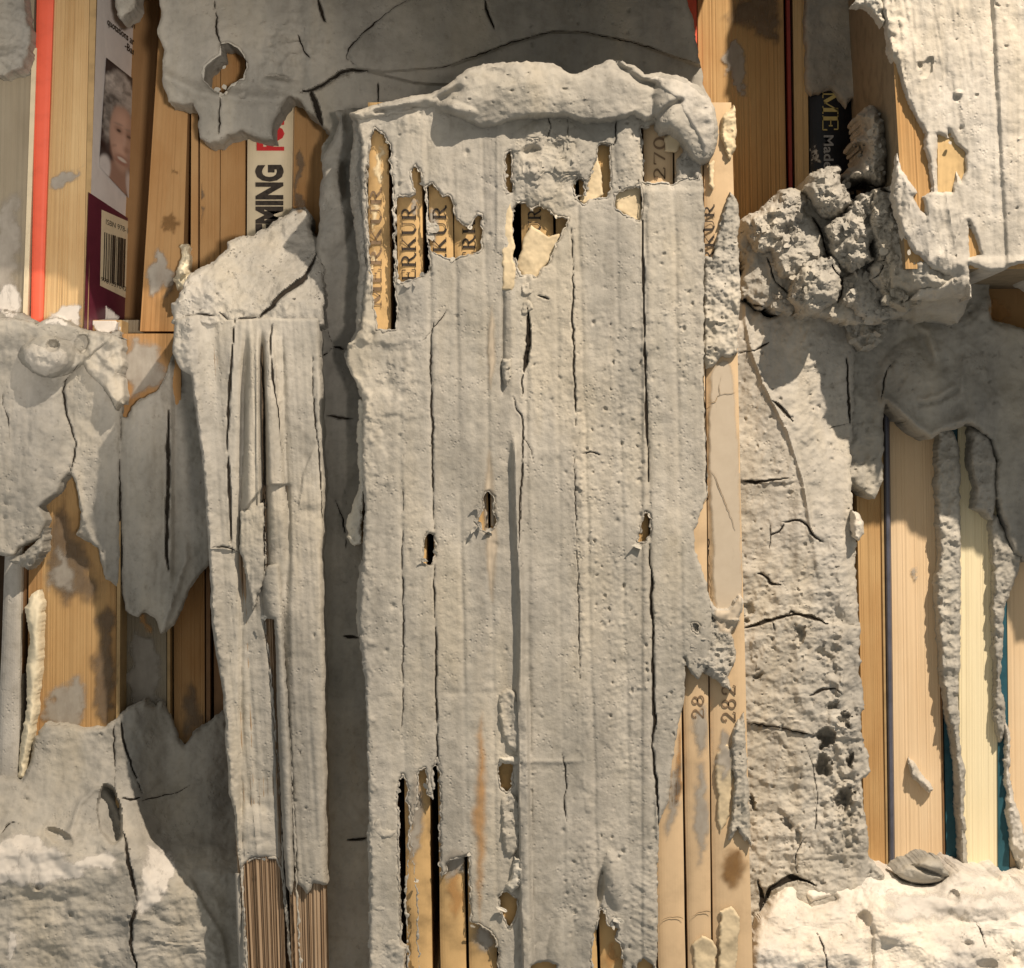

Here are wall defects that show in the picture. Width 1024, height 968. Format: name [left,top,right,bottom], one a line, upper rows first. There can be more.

spalling [201,42,248,99]
spalling [364,127,483,333]
spalling [503,150,570,278]
spalling [572,126,711,222]
crack [192,253,317,554]
crack [514,238,576,543]
crack [641,222,649,480]
crack [649,550,659,812]
crack [746,611,826,630]
spalling [241,615,303,968]
spalling [396,757,519,968]
crack [753,723,818,912]